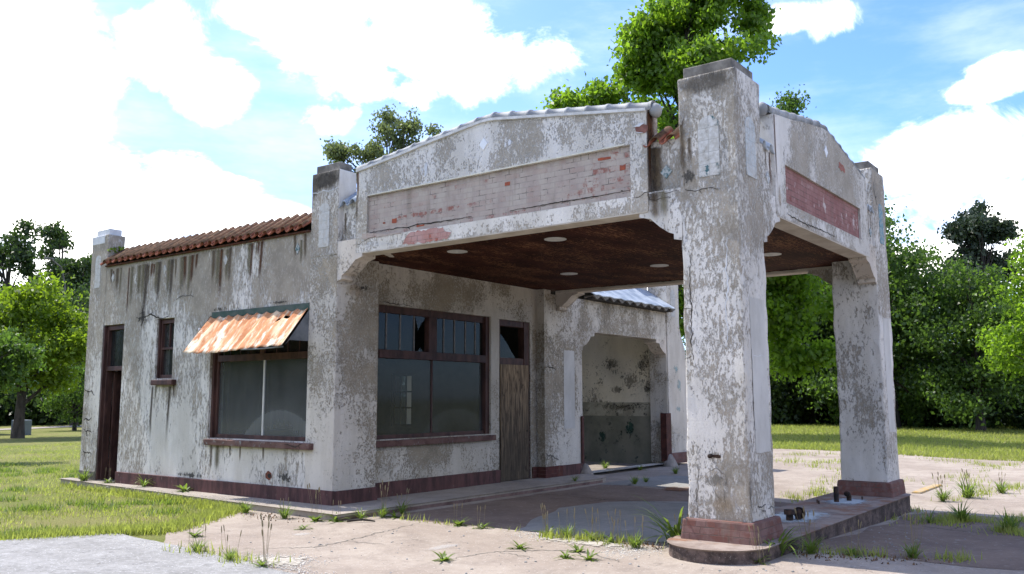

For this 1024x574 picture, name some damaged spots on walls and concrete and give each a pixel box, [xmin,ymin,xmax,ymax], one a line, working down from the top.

crack [510,187,716,211]
damp [212,248,231,287]
damp [138,259,176,326]
rust [183,308,308,354]